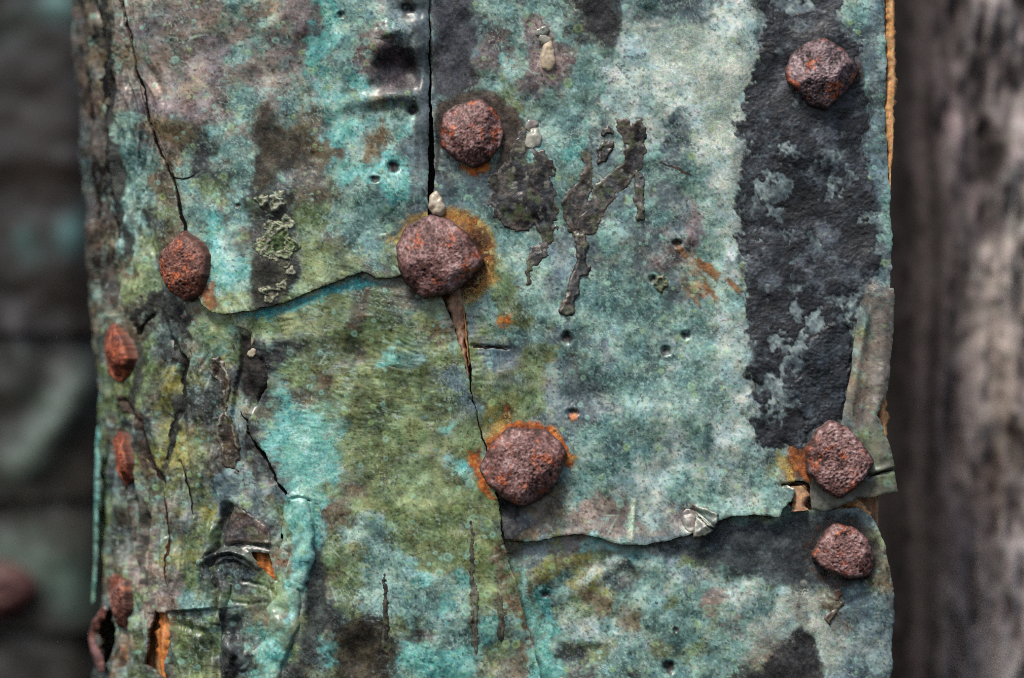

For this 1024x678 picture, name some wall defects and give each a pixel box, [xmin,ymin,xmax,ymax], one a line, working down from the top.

crack [86,0,196,238]
corrosion [201,282,217,310]
corrosion [394,209,497,304]
damp [652,0,883,449]
crack [473,343,508,351]
crack [240,411,310,501]
corrosion [469,403,576,499]
corrosion [778,445,811,483]
peeling [223,506,271,546]
corrosion [804,515,879,588]